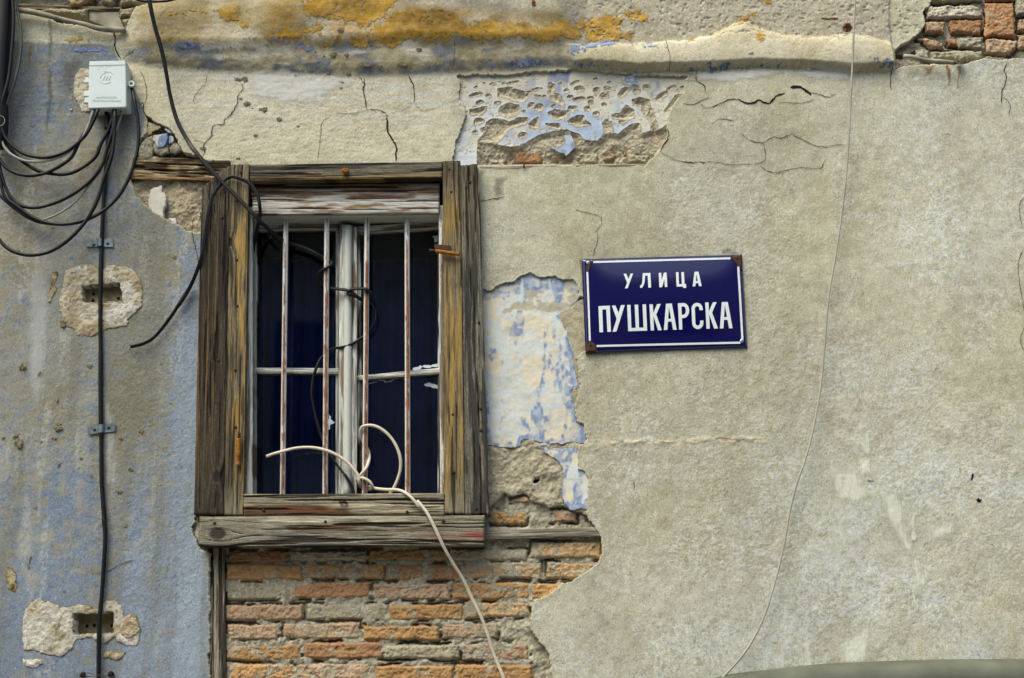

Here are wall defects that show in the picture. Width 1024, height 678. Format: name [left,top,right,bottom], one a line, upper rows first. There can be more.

spalling [874,0,1024,70]
spalling [139,120,189,159]
crack [194,83,243,155]
crack [318,77,452,160]
spalling [158,0,782,166]
crack [661,41,842,173]
spalling [132,180,208,233]
spalling [225,273,602,678]
peeling [103,650,126,660]
peeling [120,613,141,638]